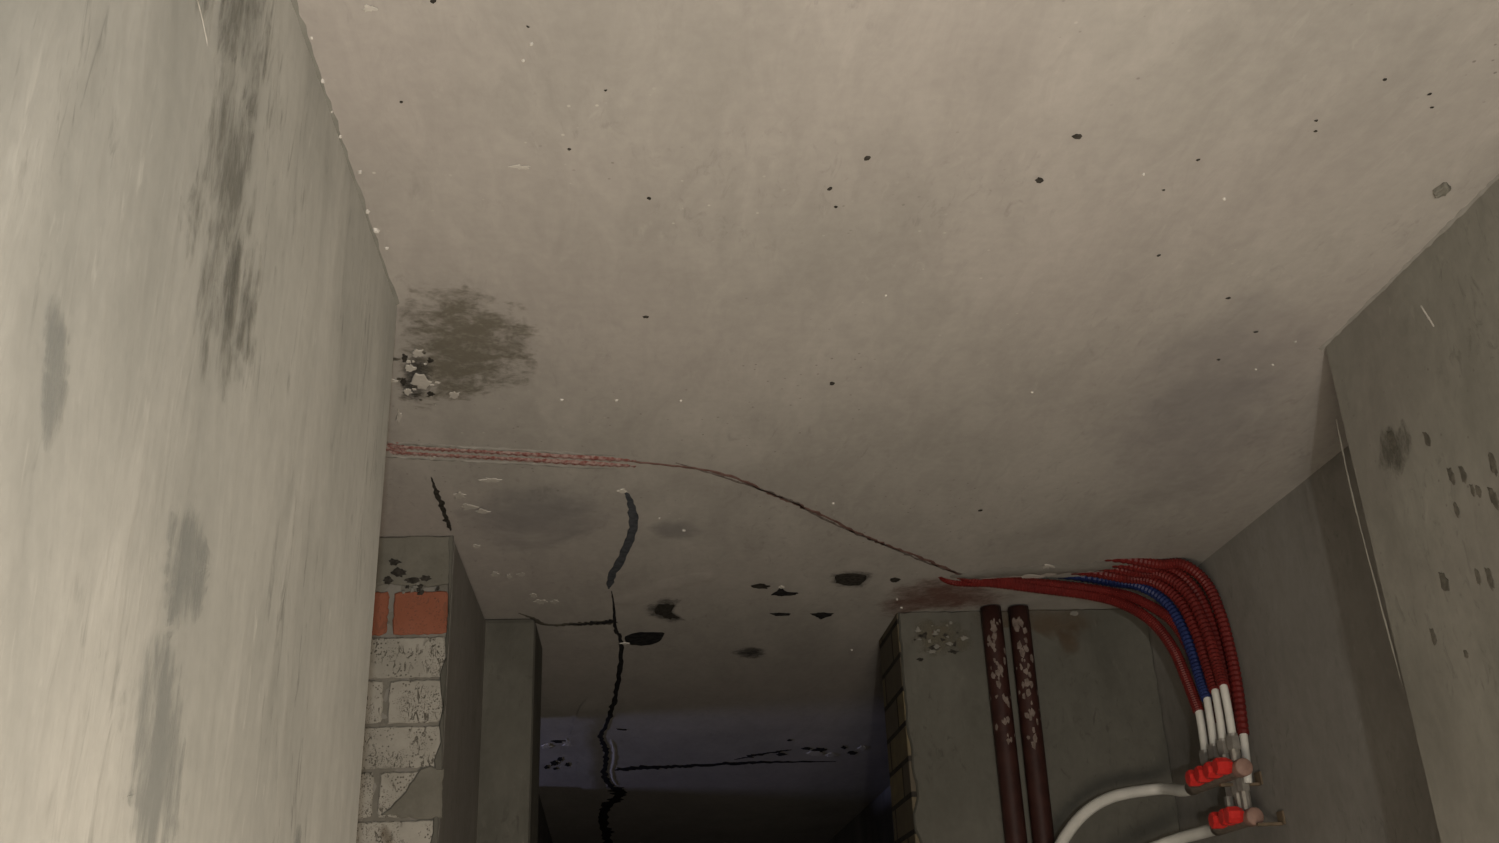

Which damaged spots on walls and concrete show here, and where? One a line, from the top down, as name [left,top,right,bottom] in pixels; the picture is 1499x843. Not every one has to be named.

water stain [413,301,525,396]
crack [385,441,982,843]